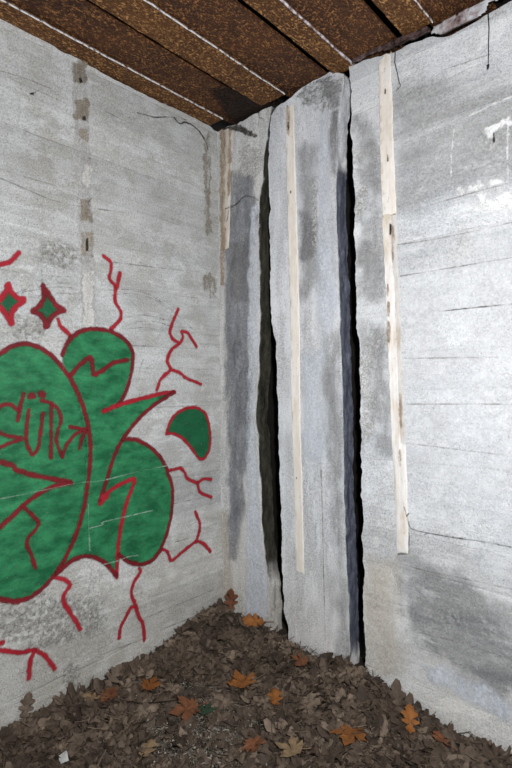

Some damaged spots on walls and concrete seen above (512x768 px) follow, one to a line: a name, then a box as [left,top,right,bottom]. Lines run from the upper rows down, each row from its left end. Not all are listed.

crack [137,112,208,148]
leakage [398,85,512,208]
leakage [222,145,268,625]
crack [267,290,287,621]
crack [345,111,366,659]
leakage [365,556,512,720]